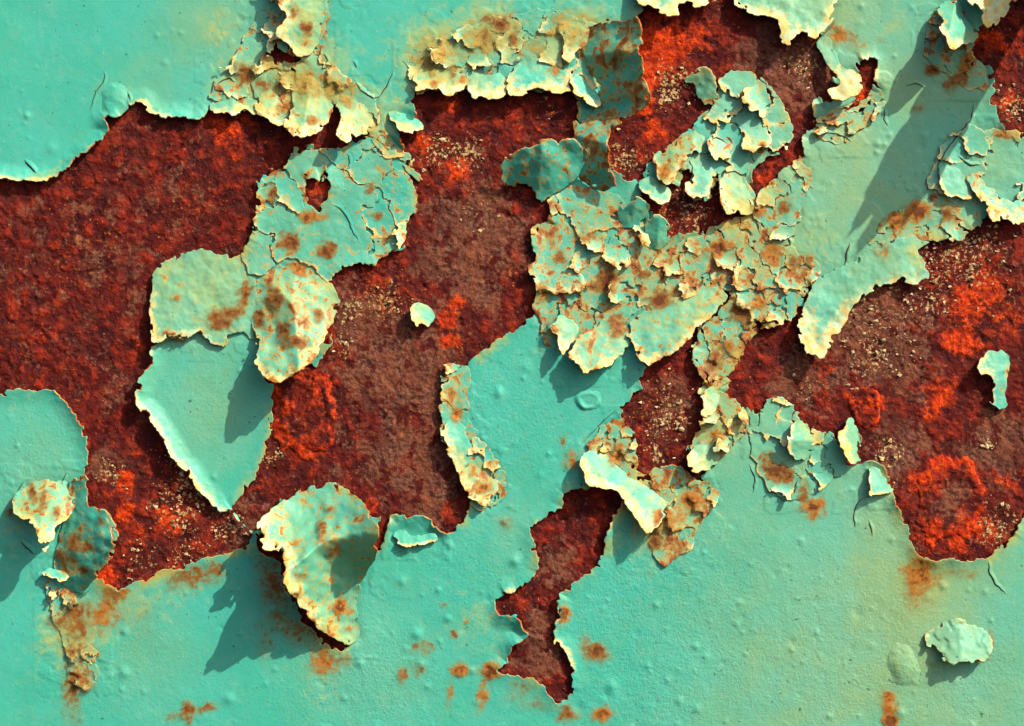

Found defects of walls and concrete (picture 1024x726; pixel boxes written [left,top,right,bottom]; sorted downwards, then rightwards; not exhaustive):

crack [346,153,354,169]
corrosion [706,134,733,161]
crack [332,202,363,243]
corrosion [595,263,619,293]
corrosion [207,280,255,330]
corrosion [550,315,579,355]
corrosion [759,452,796,484]
corrosion [798,486,826,520]
corrosion [393,529,438,548]
corrosion [333,599,354,615]
peeling [925,618,993,665]
corrosion [476,661,502,707]